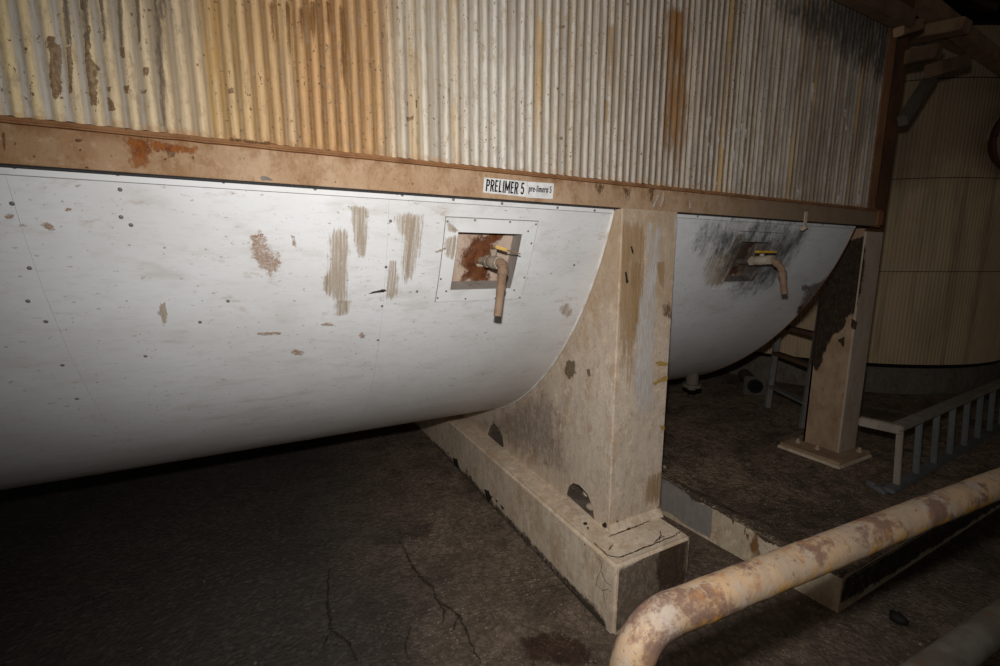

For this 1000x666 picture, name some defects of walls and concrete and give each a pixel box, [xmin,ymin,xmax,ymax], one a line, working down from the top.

rust [0,115,878,211]
rust [461,233,503,281]
crack [594,507,681,601]
rust [746,533,760,555]
crack [399,541,481,663]